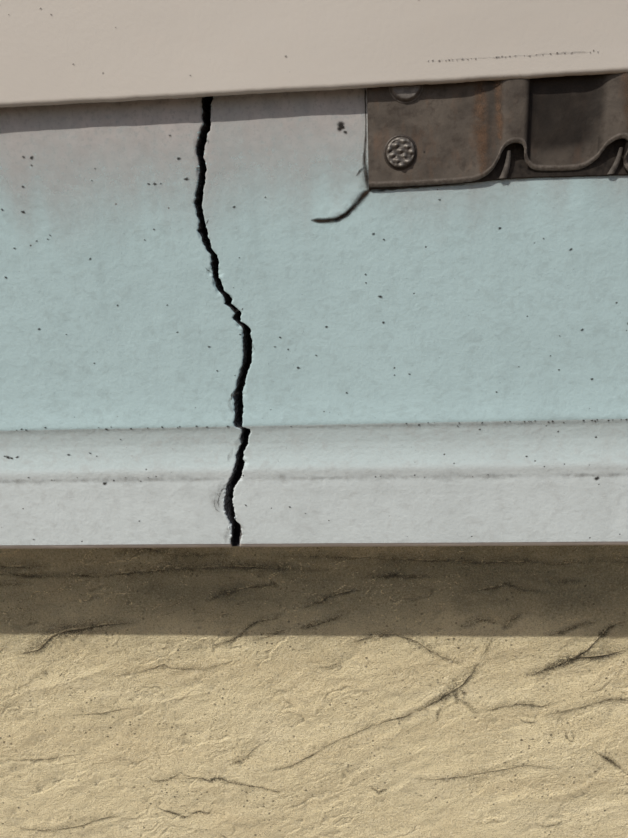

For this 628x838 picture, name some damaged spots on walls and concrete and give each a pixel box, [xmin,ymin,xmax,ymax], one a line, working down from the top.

crack [194,95,253,546]
crack [312,90,464,223]